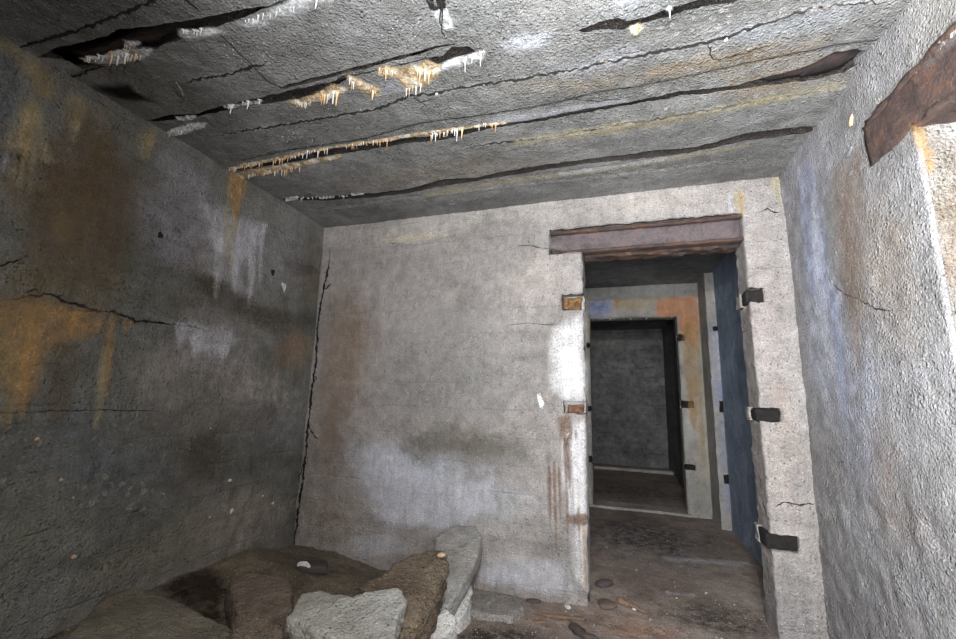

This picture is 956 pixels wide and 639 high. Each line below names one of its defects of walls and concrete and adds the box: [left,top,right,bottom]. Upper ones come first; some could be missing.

crack [19,0,891,170]
crack [283,126,814,201]
crack [7,288,211,332]
crack [294,247,331,545]
corrosion [549,416,587,534]